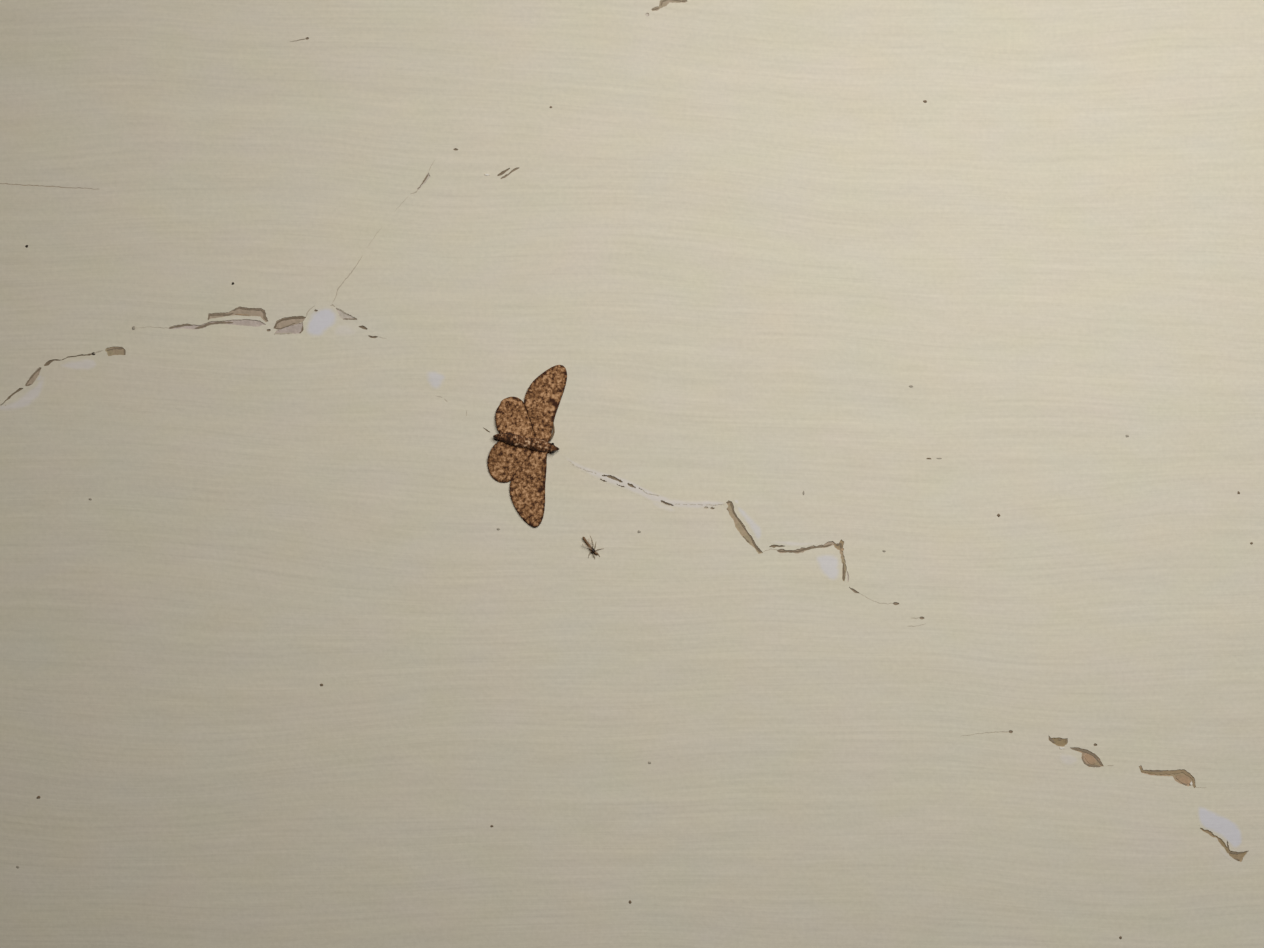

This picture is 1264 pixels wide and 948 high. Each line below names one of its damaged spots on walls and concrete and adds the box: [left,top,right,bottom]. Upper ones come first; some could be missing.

crack [333,149,458,302]
crack [0,351,101,413]
crack [561,453,725,513]
crack [765,539,924,627]
peeling [1139,765,1202,788]
spalling [1196,805,1248,862]